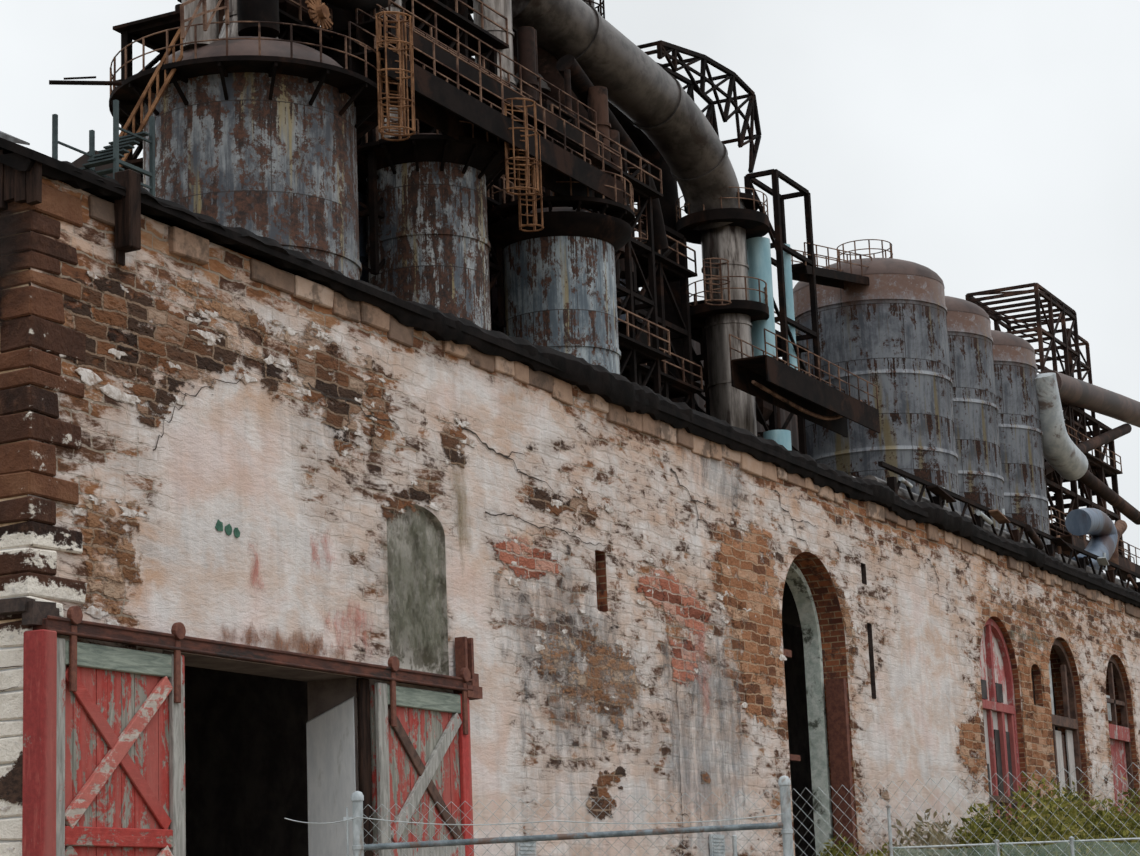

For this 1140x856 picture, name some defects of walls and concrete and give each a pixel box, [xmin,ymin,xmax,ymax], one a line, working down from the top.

spalling [47,247,396,458]
spalling [72,495,149,626]
crack [153,370,244,451]
spalling [381,473,441,523]
water stain [386,512,445,660]
spalling [438,418,477,468]
crack [461,427,553,491]
peeling [493,529,559,587]
crack [485,511,606,546]
peeling [627,518,787,732]
spalling [530,609,648,742]
peeling [955,711,986,779]